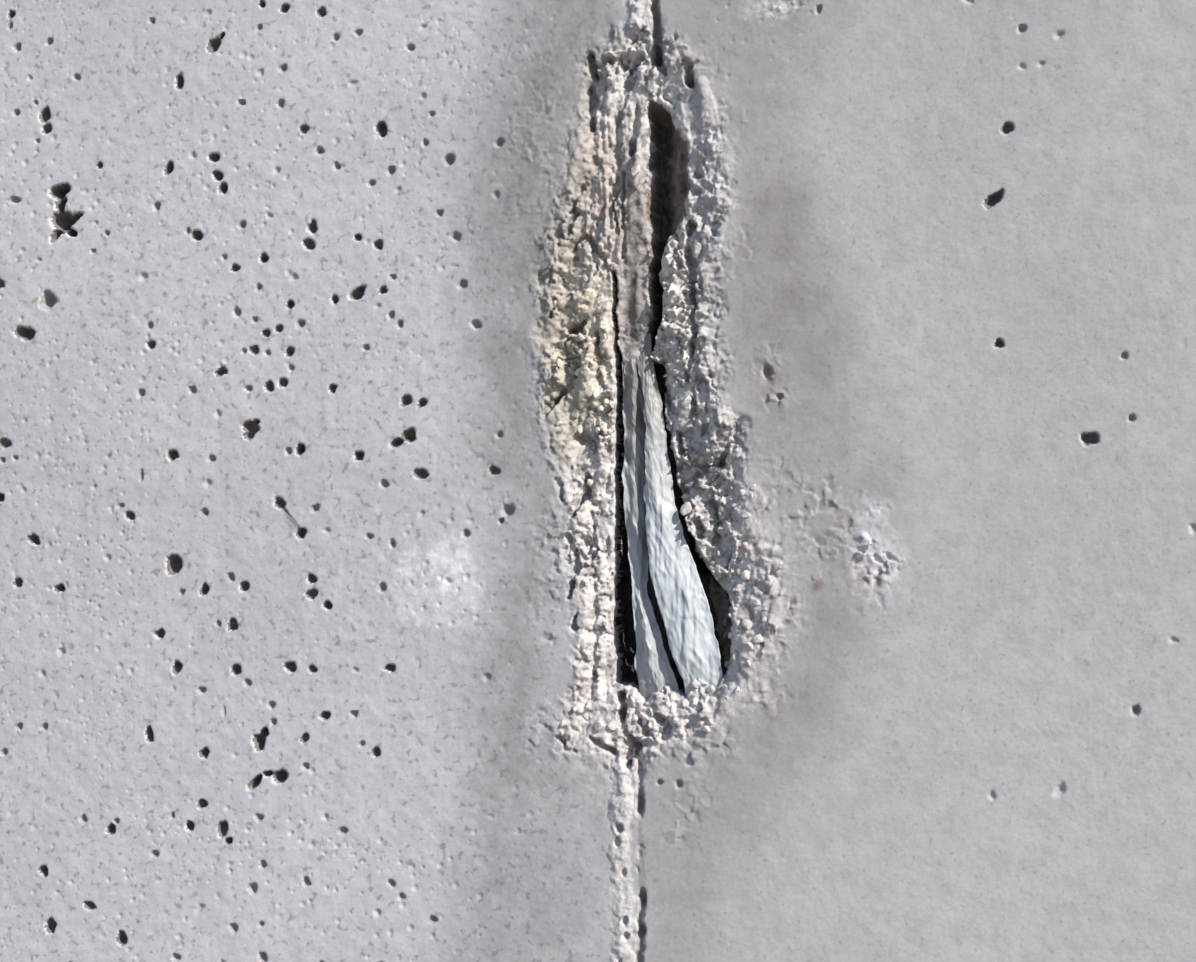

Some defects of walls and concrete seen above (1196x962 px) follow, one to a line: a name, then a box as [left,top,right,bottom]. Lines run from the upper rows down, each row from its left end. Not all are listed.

crack [622,0,662,43]
spalling [531,25,782,771]
crack [604,762,647,962]